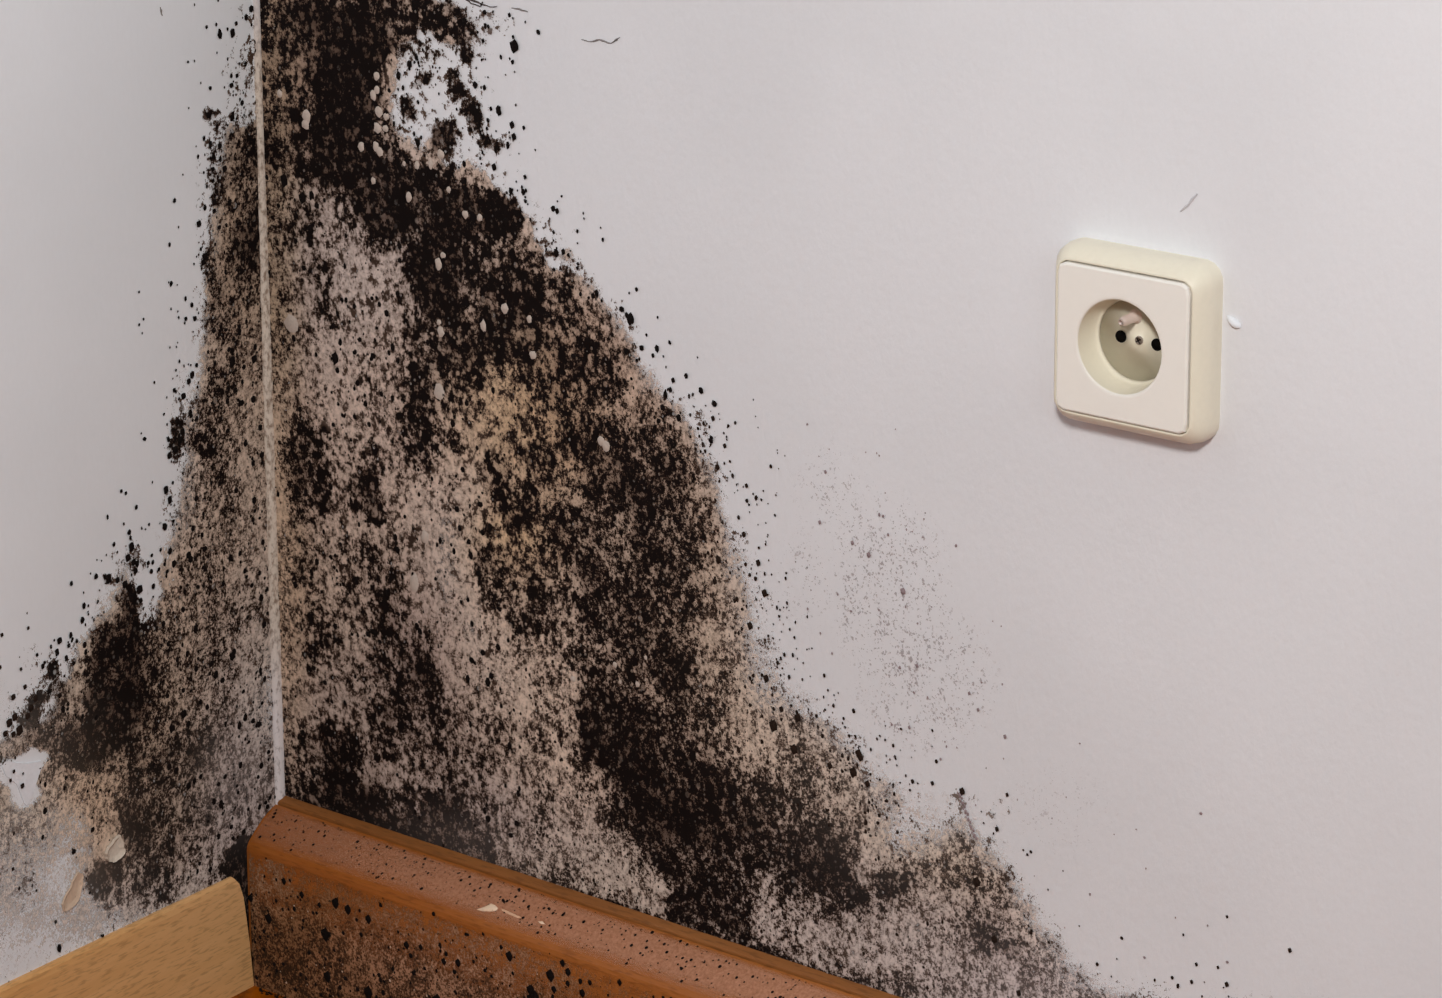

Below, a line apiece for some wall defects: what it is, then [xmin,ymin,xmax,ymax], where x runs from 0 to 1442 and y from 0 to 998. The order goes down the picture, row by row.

peeling [2,761,42,805]
damp [0,4,637,998]
damp [260,0,1165,998]